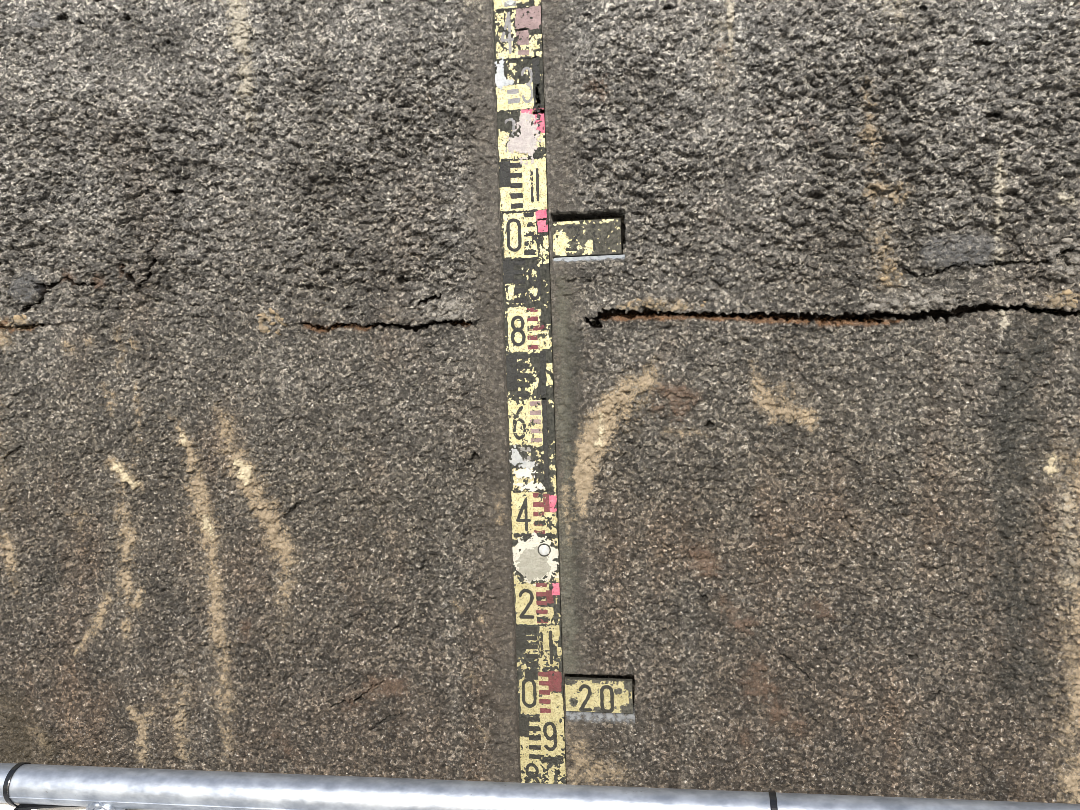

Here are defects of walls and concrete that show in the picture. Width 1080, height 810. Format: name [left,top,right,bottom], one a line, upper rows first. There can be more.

crack [120,245,160,293]
crack [904,246,1080,277]
crack [1,273,97,331]
crack [301,293,472,332]
crack [585,303,1080,328]
damp [106,457,144,490]
damp [217,413,296,611]
damp [74,503,146,657]
damp [170,417,233,758]
damp [127,706,156,765]
damp [163,680,190,760]